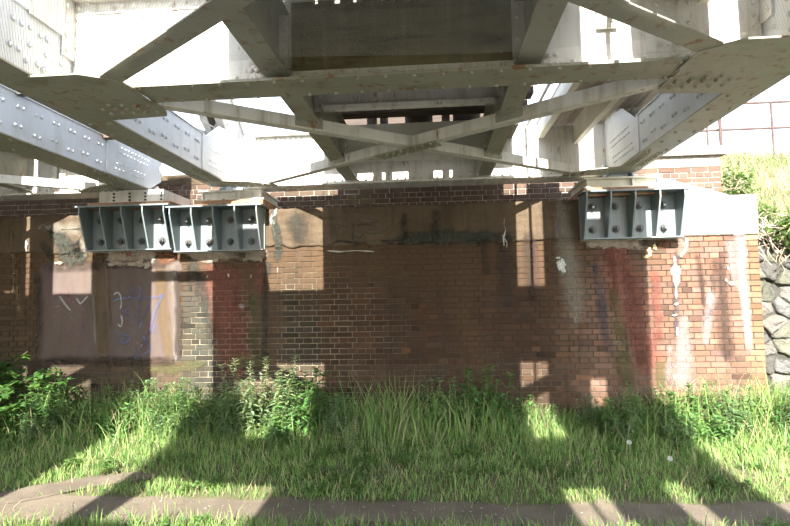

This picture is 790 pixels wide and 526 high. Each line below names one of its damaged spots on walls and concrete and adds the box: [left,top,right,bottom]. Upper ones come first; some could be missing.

water stain [40,223,212,367]
flaking render [107,251,174,269]
flaking render [188,252,267,263]
water stain [394,212,514,307]
water stain [525,234,536,296]
peeling [586,239,666,259]
efflorescence [671,238,688,336]
water stain [698,258,733,358]